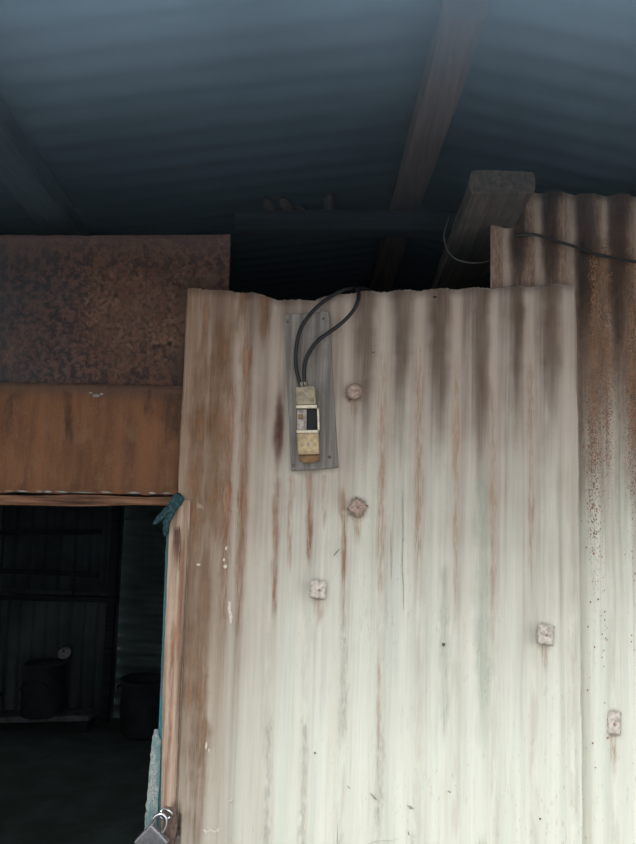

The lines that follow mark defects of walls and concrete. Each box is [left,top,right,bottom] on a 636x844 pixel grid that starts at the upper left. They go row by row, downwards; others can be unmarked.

rust [80,267,187,359]
rust [189,402,247,551]
rust [274,404,283,457]
rust [582,241,636,558]
rust [342,512,363,577]